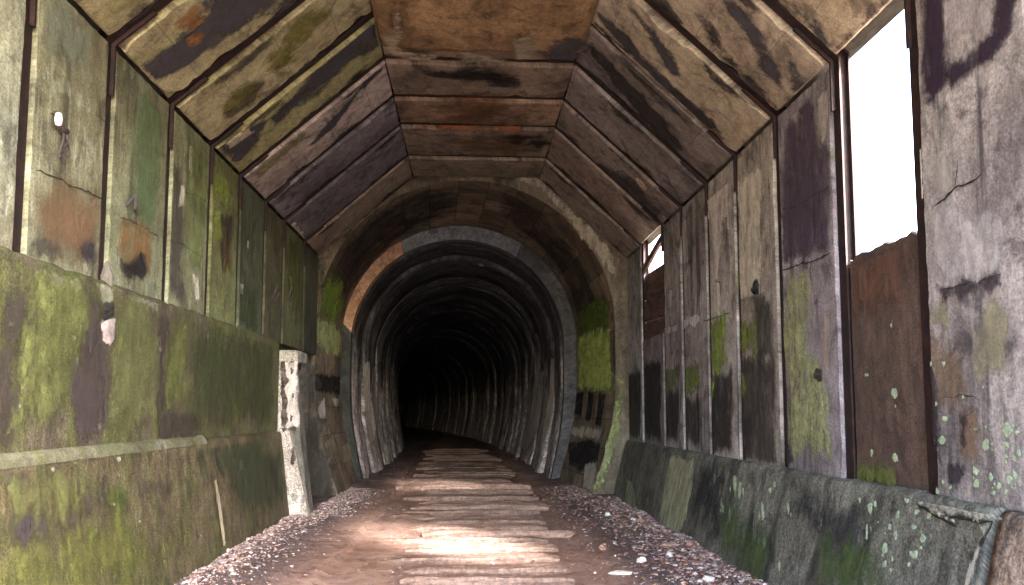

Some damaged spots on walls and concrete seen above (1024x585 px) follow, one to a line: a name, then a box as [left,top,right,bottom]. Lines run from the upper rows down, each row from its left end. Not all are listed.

damp [920,0,1016,194]
crack [36,170,202,258]
rust [118,222,151,276]
crack [933,161,981,207]
damp [0,286,26,433]
damp [70,285,113,443]
damp [133,298,197,438]
peeling [280,361,300,432]
damp [215,479,226,546]
damp [798,492,868,559]
damp [965,525,986,585]